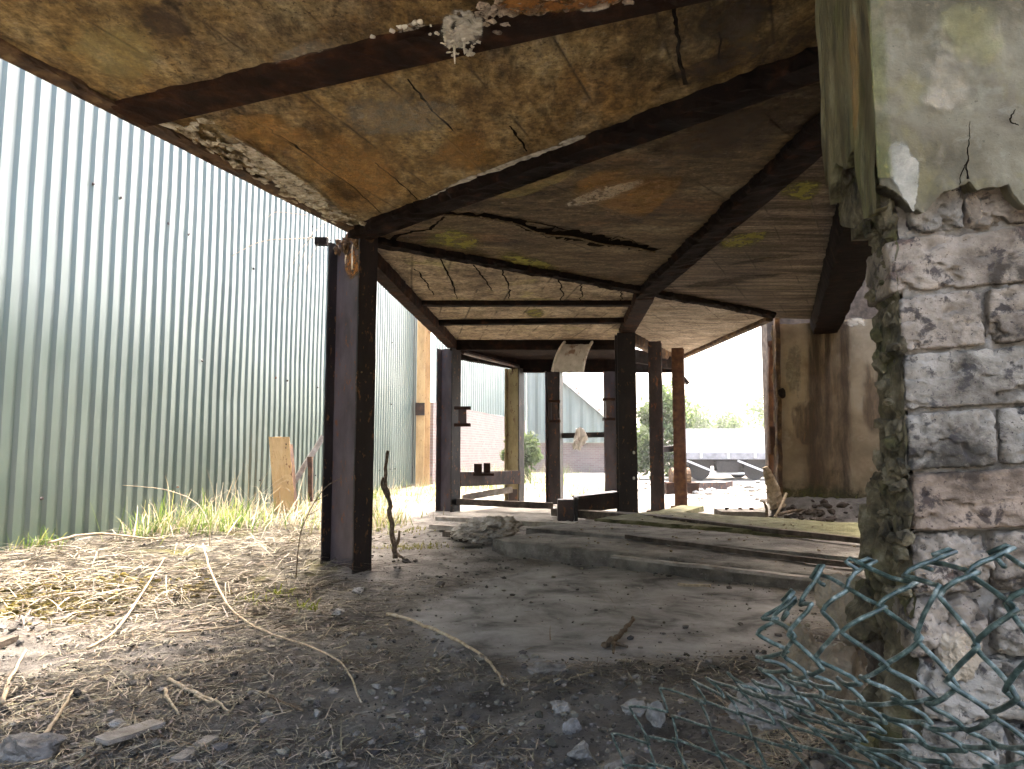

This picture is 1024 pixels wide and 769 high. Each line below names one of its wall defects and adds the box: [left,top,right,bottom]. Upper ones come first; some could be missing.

crack [672,8,688,85]
crack [407,79,453,131]
crack [509,126,527,151]
peeling [888,143,919,211]
crack [959,123,970,185]
crack [389,212,662,253]
spalling [966,195,983,222]
crack [414,259,458,298]
crack [473,265,511,298]
leakage [786,318,865,498]
leakage [863,368,880,430]